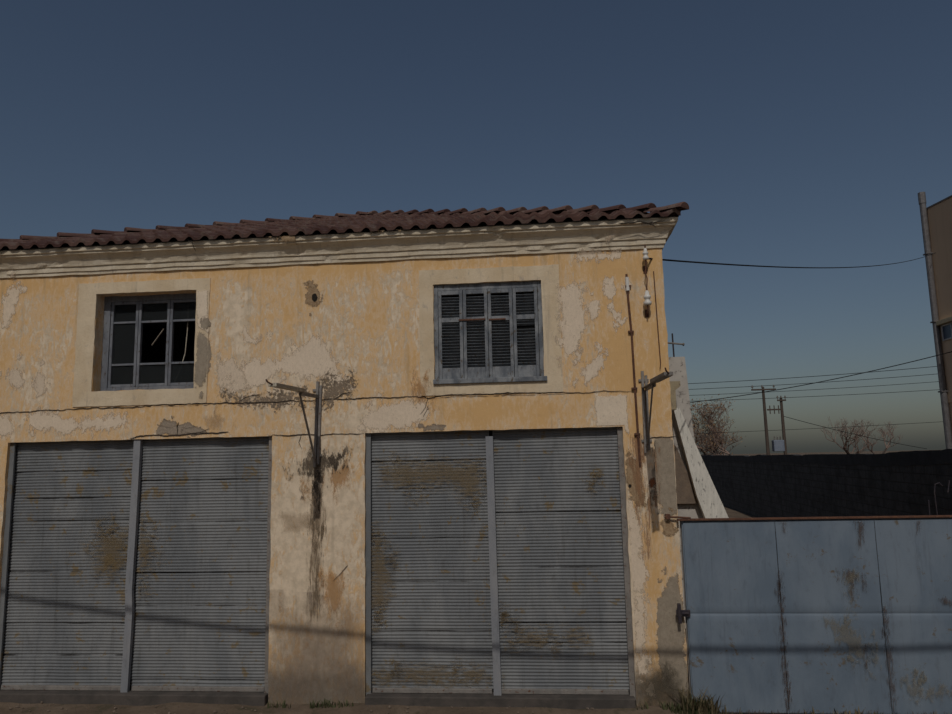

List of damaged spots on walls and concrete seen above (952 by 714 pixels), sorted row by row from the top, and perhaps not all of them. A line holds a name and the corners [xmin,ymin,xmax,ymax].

peeling [1,273,27,328]
spalling [156,416,206,437]
peeling [194,290,211,398]
peeling [219,334,358,417]
spalling [304,280,323,316]
peeling [553,276,632,387]
peeling [595,394,629,434]
leakage [283,446,352,618]
peeling [625,437,688,692]